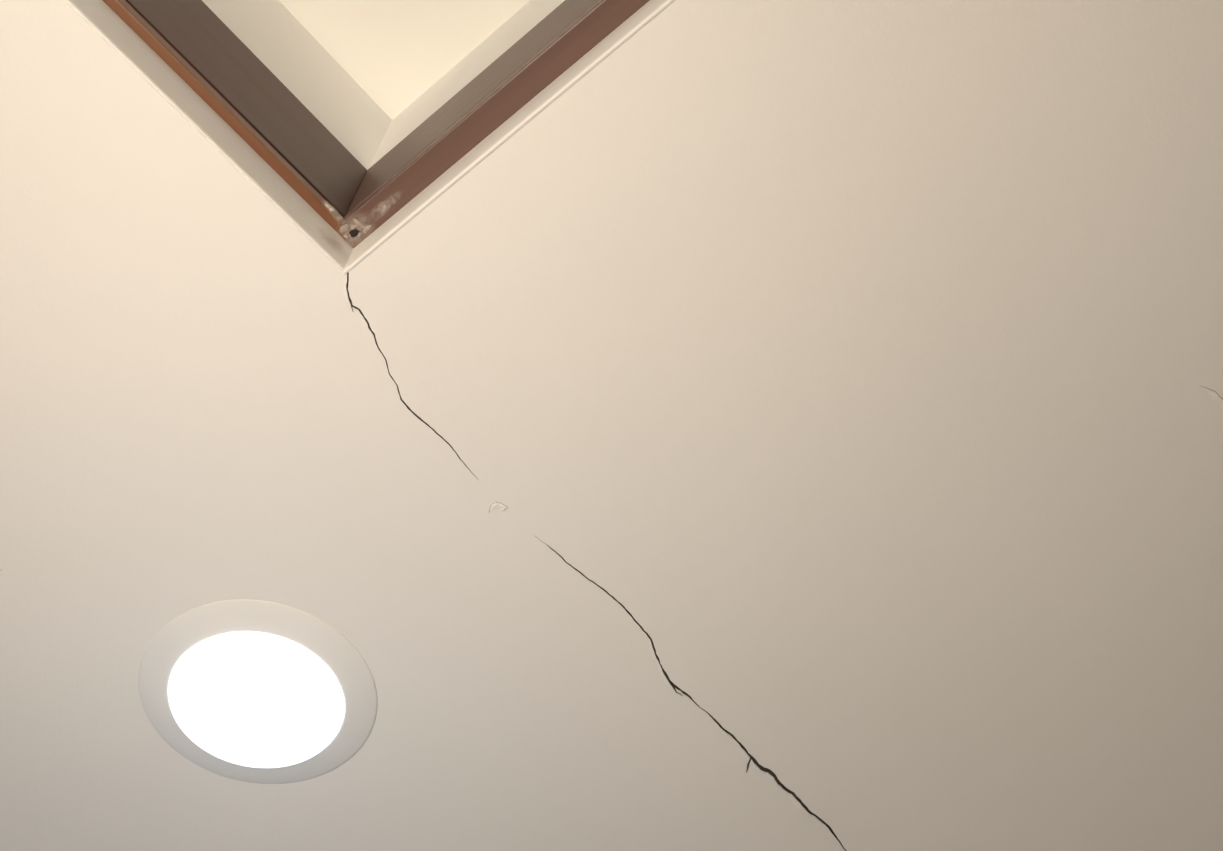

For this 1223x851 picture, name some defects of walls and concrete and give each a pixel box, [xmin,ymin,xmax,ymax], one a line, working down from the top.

crack [342,273,477,478]
crack [535,536,847,851]